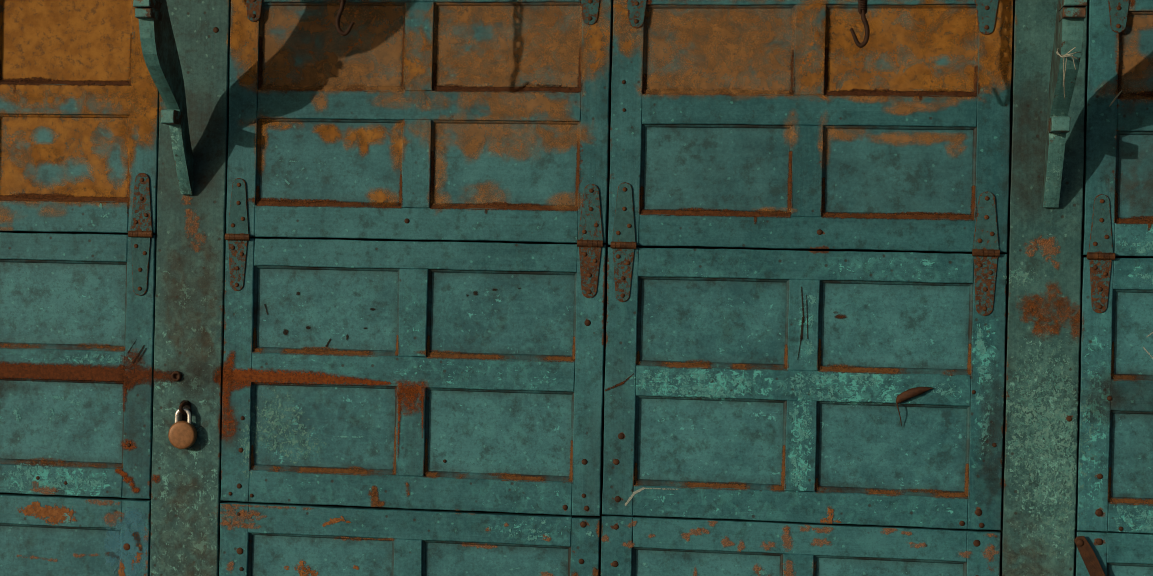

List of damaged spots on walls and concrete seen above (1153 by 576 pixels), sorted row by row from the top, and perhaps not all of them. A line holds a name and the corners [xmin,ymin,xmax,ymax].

rust [0,37,132,93]
rust [256,37,380,92]
rust [431,46,583,93]
rust [641,50,795,96]
rust [823,48,980,100]
rust [0,160,130,203]
rust [248,174,403,208]
rust [429,135,581,212]
rust [1023,284,1084,337]
rust [0,343,174,411]
peeling [632,368,763,401]
peeling [777,295,880,489]